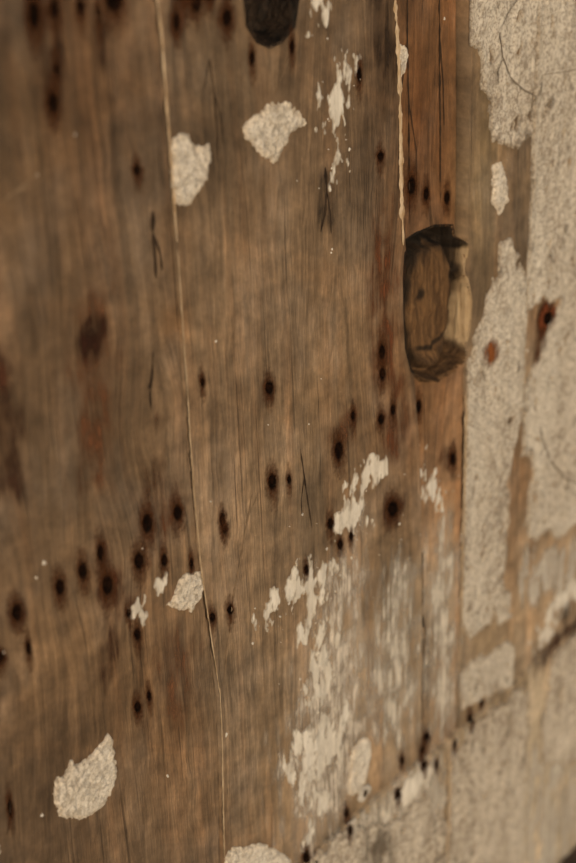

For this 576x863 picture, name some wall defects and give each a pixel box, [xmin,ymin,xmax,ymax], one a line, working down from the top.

rust [485,341,498,365]
rust [535,302,556,361]
peeling [242,0,576,863]
peeling [225,843,292,863]